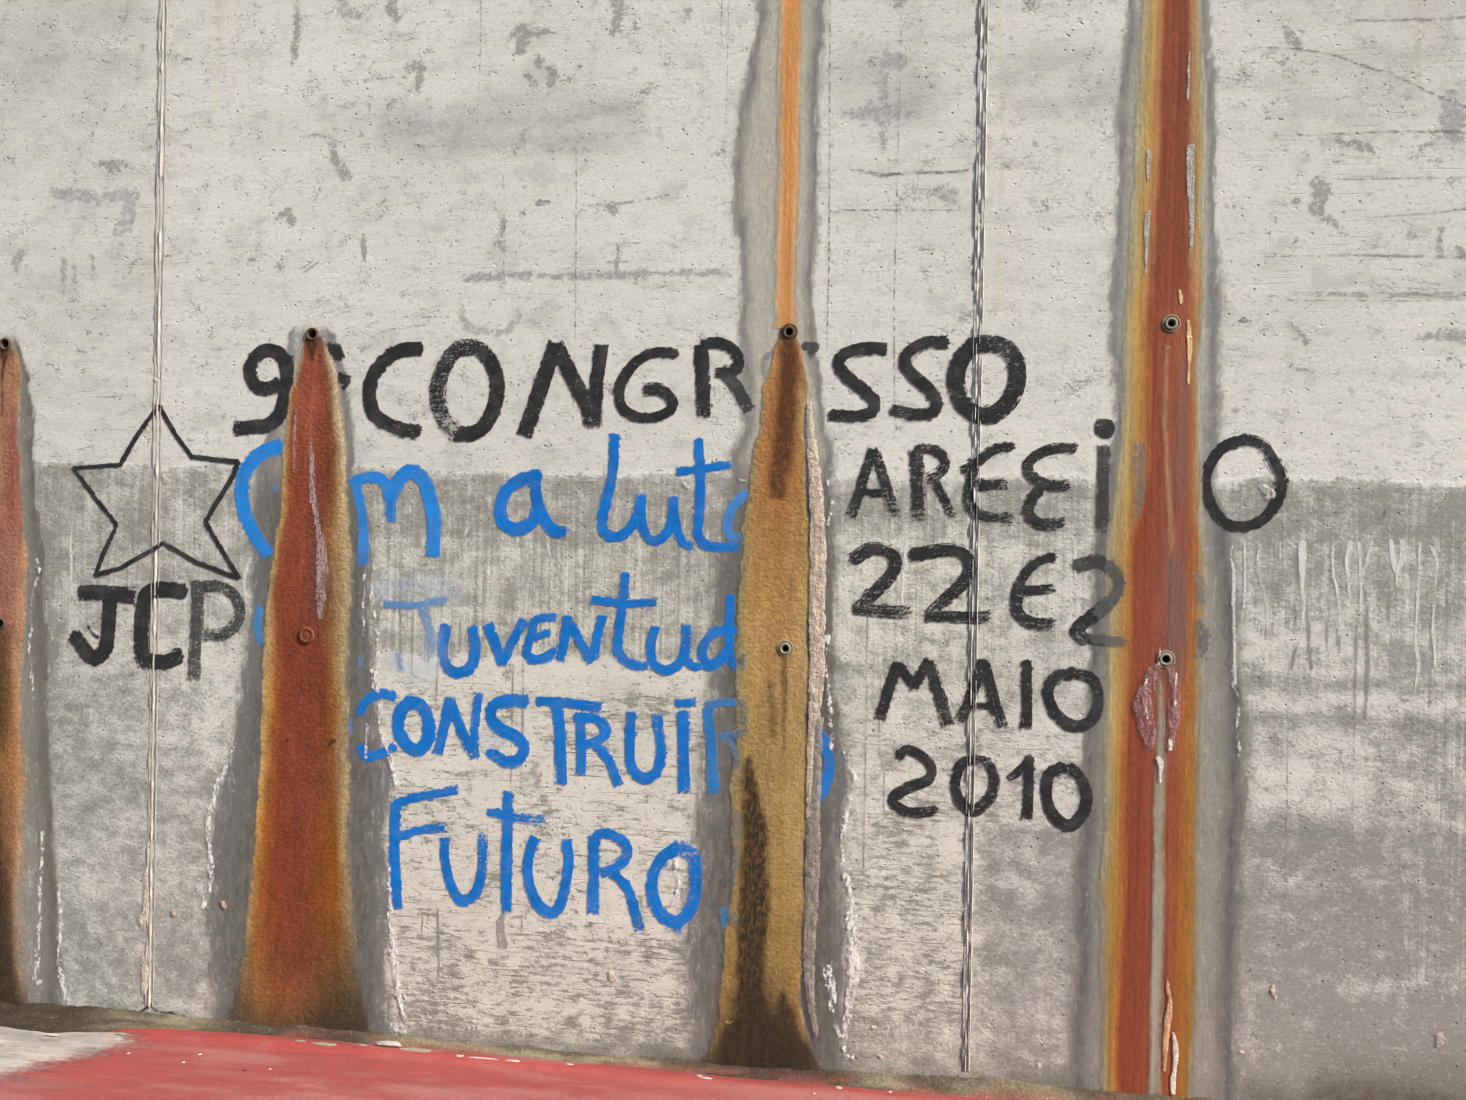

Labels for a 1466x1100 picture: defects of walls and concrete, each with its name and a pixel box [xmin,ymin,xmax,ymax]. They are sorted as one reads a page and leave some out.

rust [0,348,29,1005]
rust [228,337,370,1032]
rust [700,0,827,1071]
leakage [671,0,861,1070]
rust [1089,0,1210,1098]